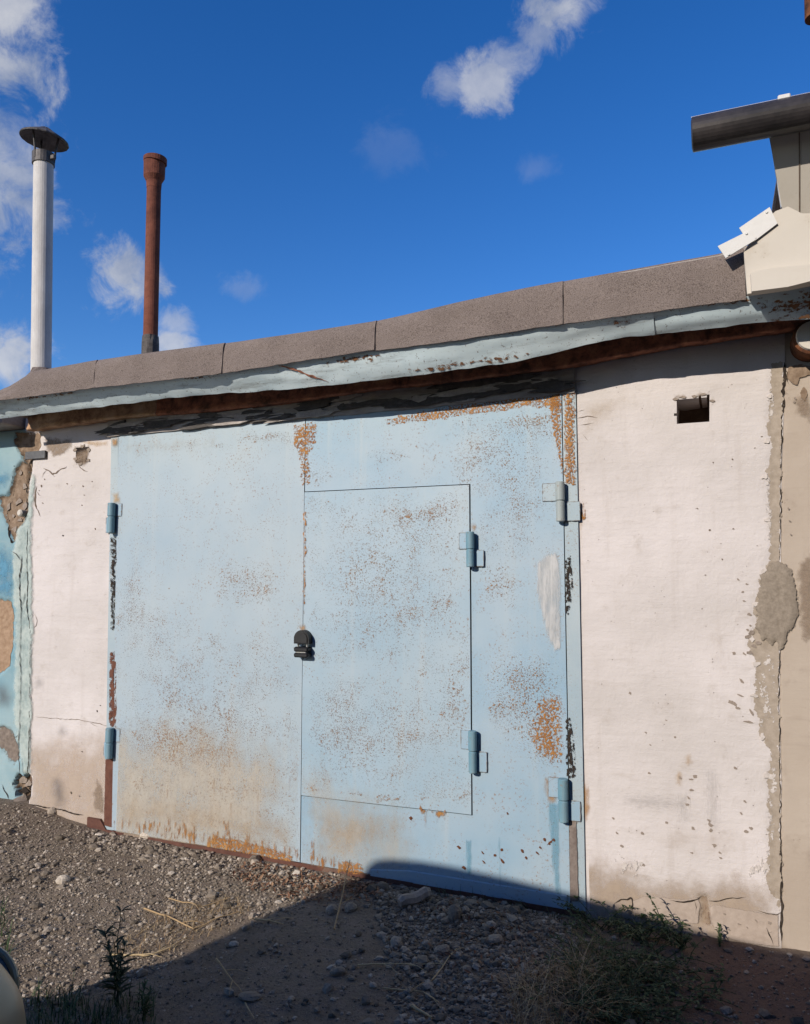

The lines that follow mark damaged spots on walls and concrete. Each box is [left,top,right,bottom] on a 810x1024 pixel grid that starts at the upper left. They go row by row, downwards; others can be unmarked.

flaking render [0,432,45,540]
flaking render [73,444,91,466]
rust [241,422,331,485]
peeling [94,373,586,435]
rust [387,393,576,598]
flaking render [0,599,14,673]
rust [117,494,471,874]
rust [487,654,564,765]
peeling [728,361,810,907]
crack [670,653,784,942]